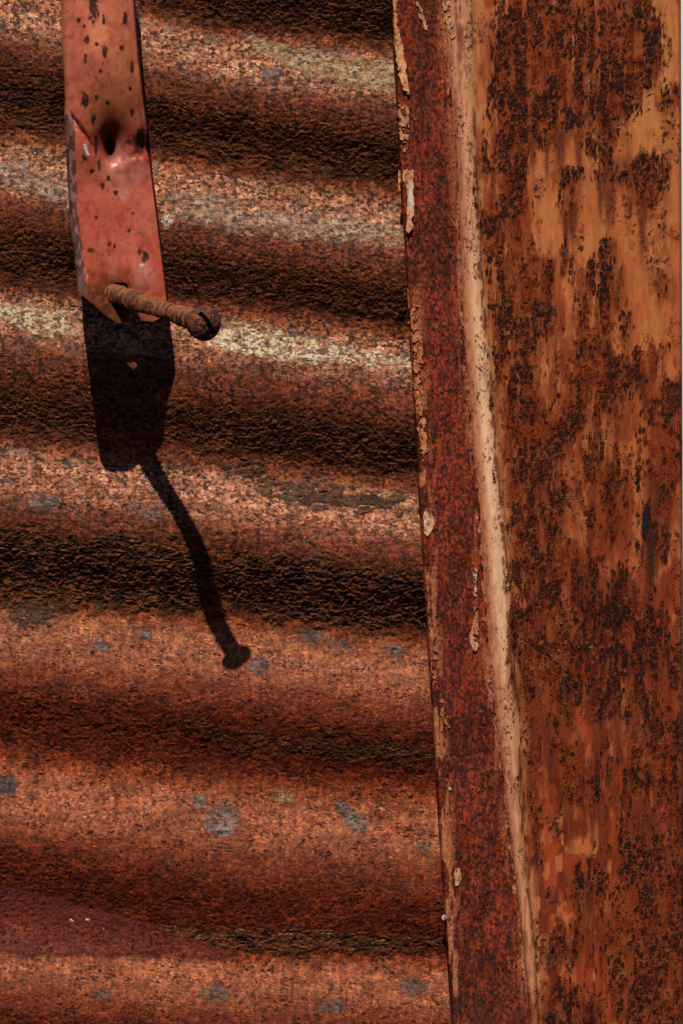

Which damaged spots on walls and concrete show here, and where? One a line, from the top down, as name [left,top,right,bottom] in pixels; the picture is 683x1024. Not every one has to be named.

peeling [393,0,410,152]
peeling [398,170,415,233]
corrosion [213,445,419,518]
corrosion [470,0,683,1024]
corrosion [166,922,445,959]